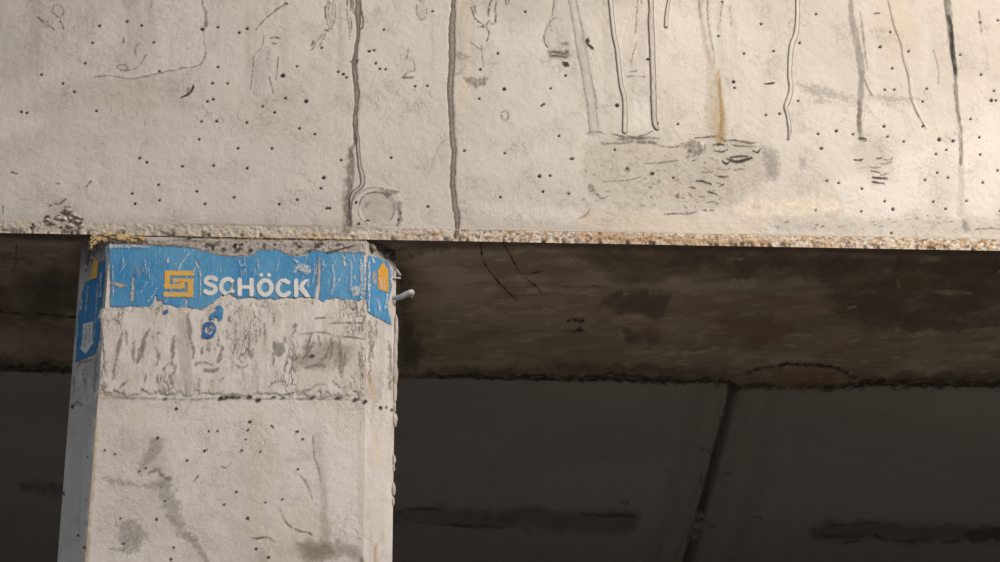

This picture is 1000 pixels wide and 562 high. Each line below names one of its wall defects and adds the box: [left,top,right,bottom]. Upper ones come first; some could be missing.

crack [344,0,365,232]
crack [447,0,539,301]
leakage [608,0,628,134]
leakage [648,0,670,131]
leakage [784,0,800,140]
leakage [849,0,873,140]
leakage [944,0,962,165]